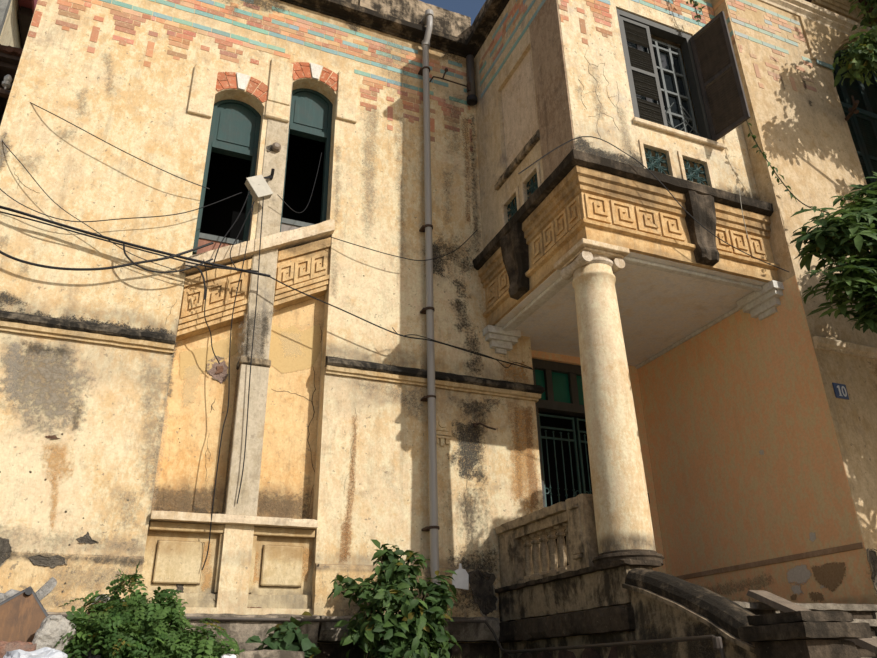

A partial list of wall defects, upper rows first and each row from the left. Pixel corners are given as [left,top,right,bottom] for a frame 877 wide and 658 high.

crack [578,54,619,138]
damp [0,291,169,334]
damp [0,343,86,436]
peeling [179,336,238,406]
damp [152,370,239,514]
crack [272,369,316,507]
rust [340,427,356,561]
damp [448,399,506,481]
rust [510,407,538,515]
flaking render [0,537,12,567]
flaking render [29,554,67,568]
flaking render [68,532,99,546]